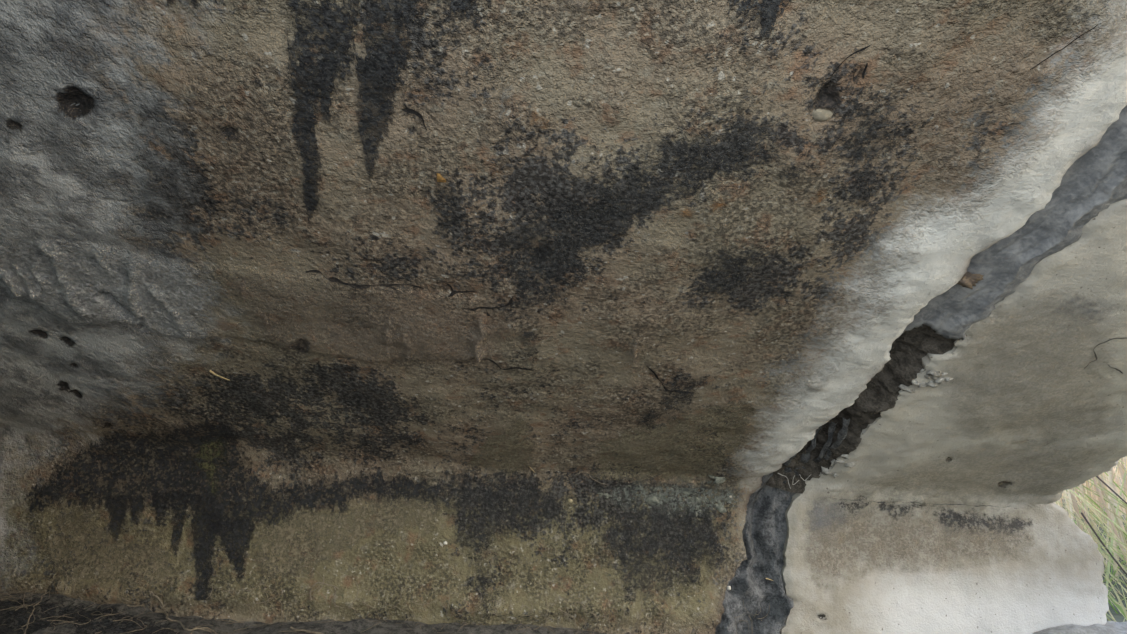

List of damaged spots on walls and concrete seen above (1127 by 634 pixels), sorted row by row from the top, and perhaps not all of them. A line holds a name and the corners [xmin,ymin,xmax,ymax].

water stain [727,0,791,39]
crack [829,45,871,79]
crack [1030,24,1098,70]
water stain [281,0,491,222]
water stain [837,89,903,207]
water stain [491,119,810,305]
crack [1084,338,1125,374]
water stain [637,372,717,428]
water stain [23,418,571,601]
crack [829,497,1009,507]
water stain [590,475,737,614]